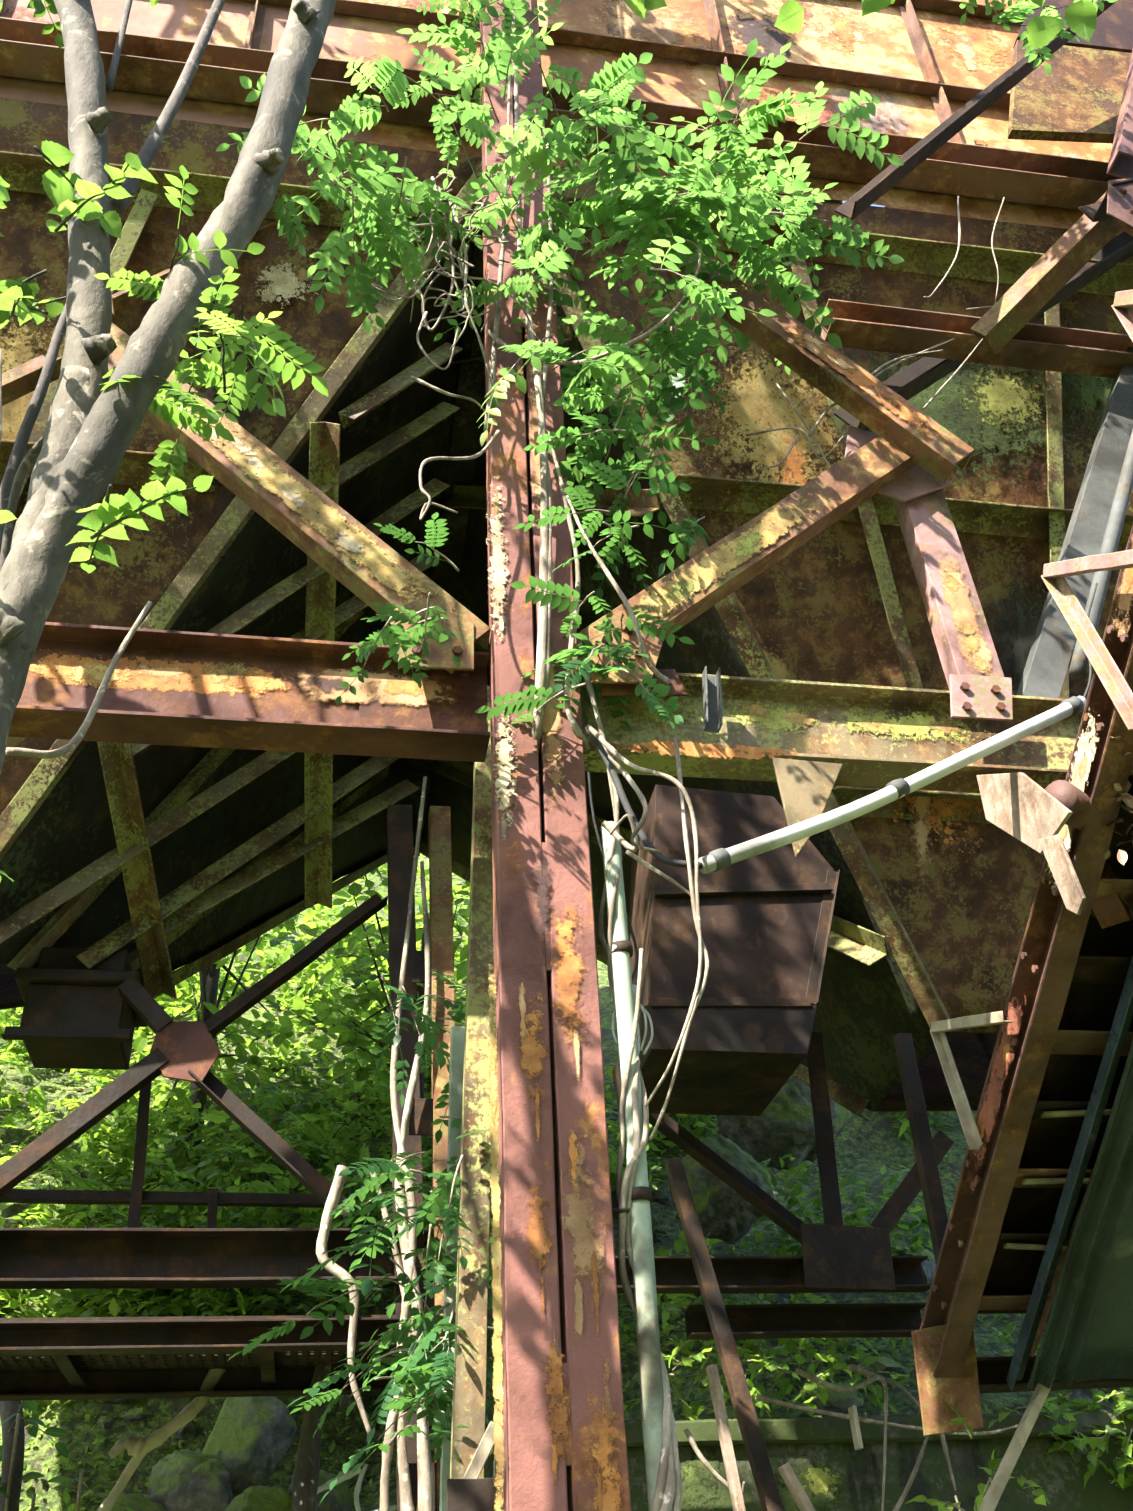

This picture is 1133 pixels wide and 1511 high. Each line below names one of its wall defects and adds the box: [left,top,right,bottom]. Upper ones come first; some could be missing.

corrosion [597,0,902,135]
corrosion [201,312,270,440]
corrosion [29,649,456,707]
corrosion [939,550,999,677]
corrosion [1111,568,1133,637]
corrosion [614,740,795,760]
corrosion [880,790,997,891]
corrosion [518,860,590,1143]
corrosion [968,996,1026,1191]
corrosion [488,930,505,1511]
corrosion [524,1130,606,1485]
corrosion [588,1361,622,1511]